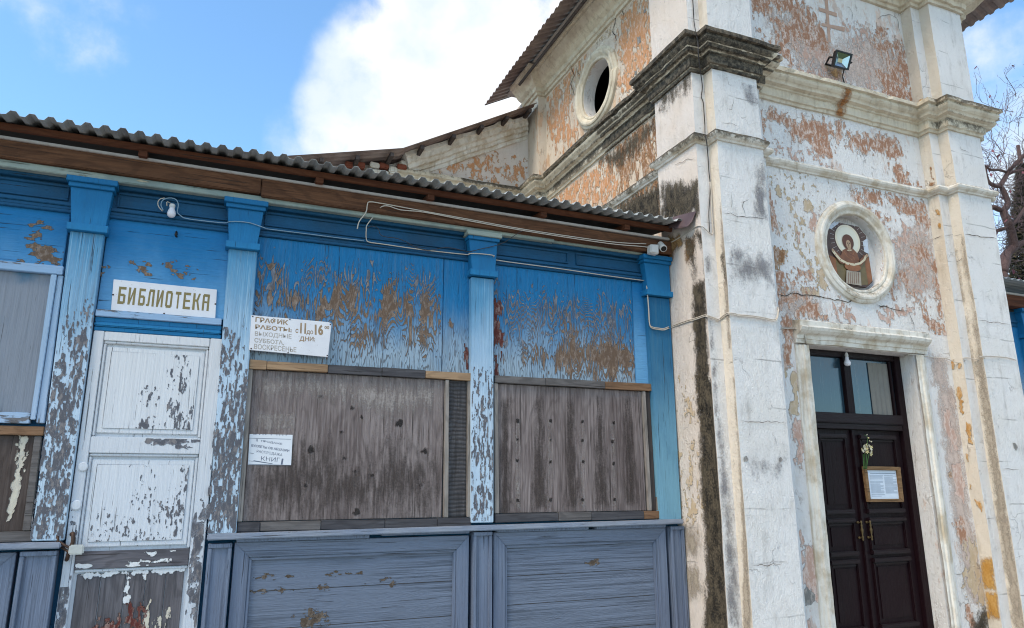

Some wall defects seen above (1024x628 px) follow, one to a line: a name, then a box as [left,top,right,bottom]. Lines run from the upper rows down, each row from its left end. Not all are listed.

peeling [537,54,587,156]
peeling [556,116,658,210]
peeling [596,0,652,102]
leakage [598,123,656,168]
peeling [16,220,64,266]
peeling [254,247,454,358]
crack [779,293,851,303]
peeling [760,105,947,469]
peeling [463,278,635,521]
leakage [619,179,750,628]
peeling [6,299,248,628]
peeling [941,386,985,628]